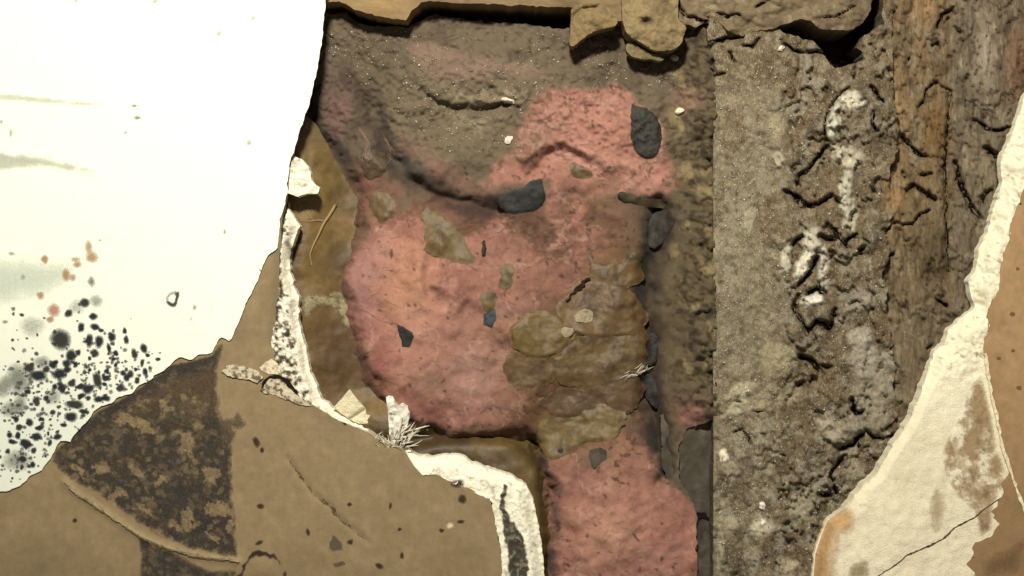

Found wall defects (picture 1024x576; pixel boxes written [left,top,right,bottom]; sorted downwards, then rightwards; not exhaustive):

mould [0,299,277,576]
spalling [288,157,321,198]
spalling [271,209,370,431]
spalling [405,446,545,576]
crack [787,82,1010,386]
spalling [811,93,1024,576]
crack [878,498,1000,576]
leakage [946,385,1001,532]